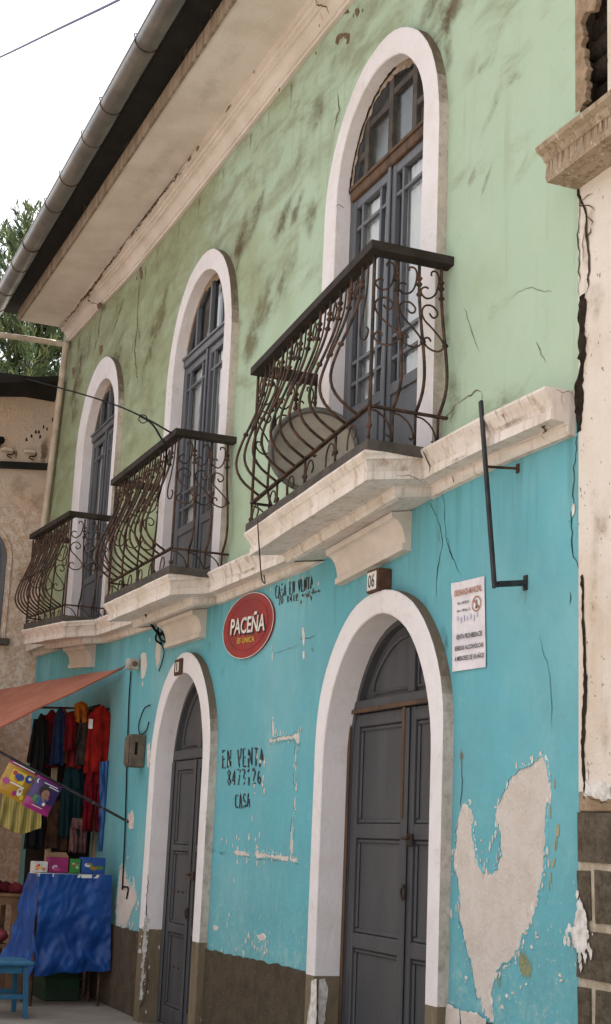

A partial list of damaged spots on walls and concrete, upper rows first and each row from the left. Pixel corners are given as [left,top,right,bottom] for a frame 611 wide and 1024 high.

spalling [575,0,601,113]
crack [60,169,183,379]
crack [576,193,595,294]
crack [398,449,459,581]
peeling [221,716,301,866]
peeling [584,770,611,801]
peeling [115,857,160,1013]
peeling [445,751,560,1024]
peeling [563,890,593,973]